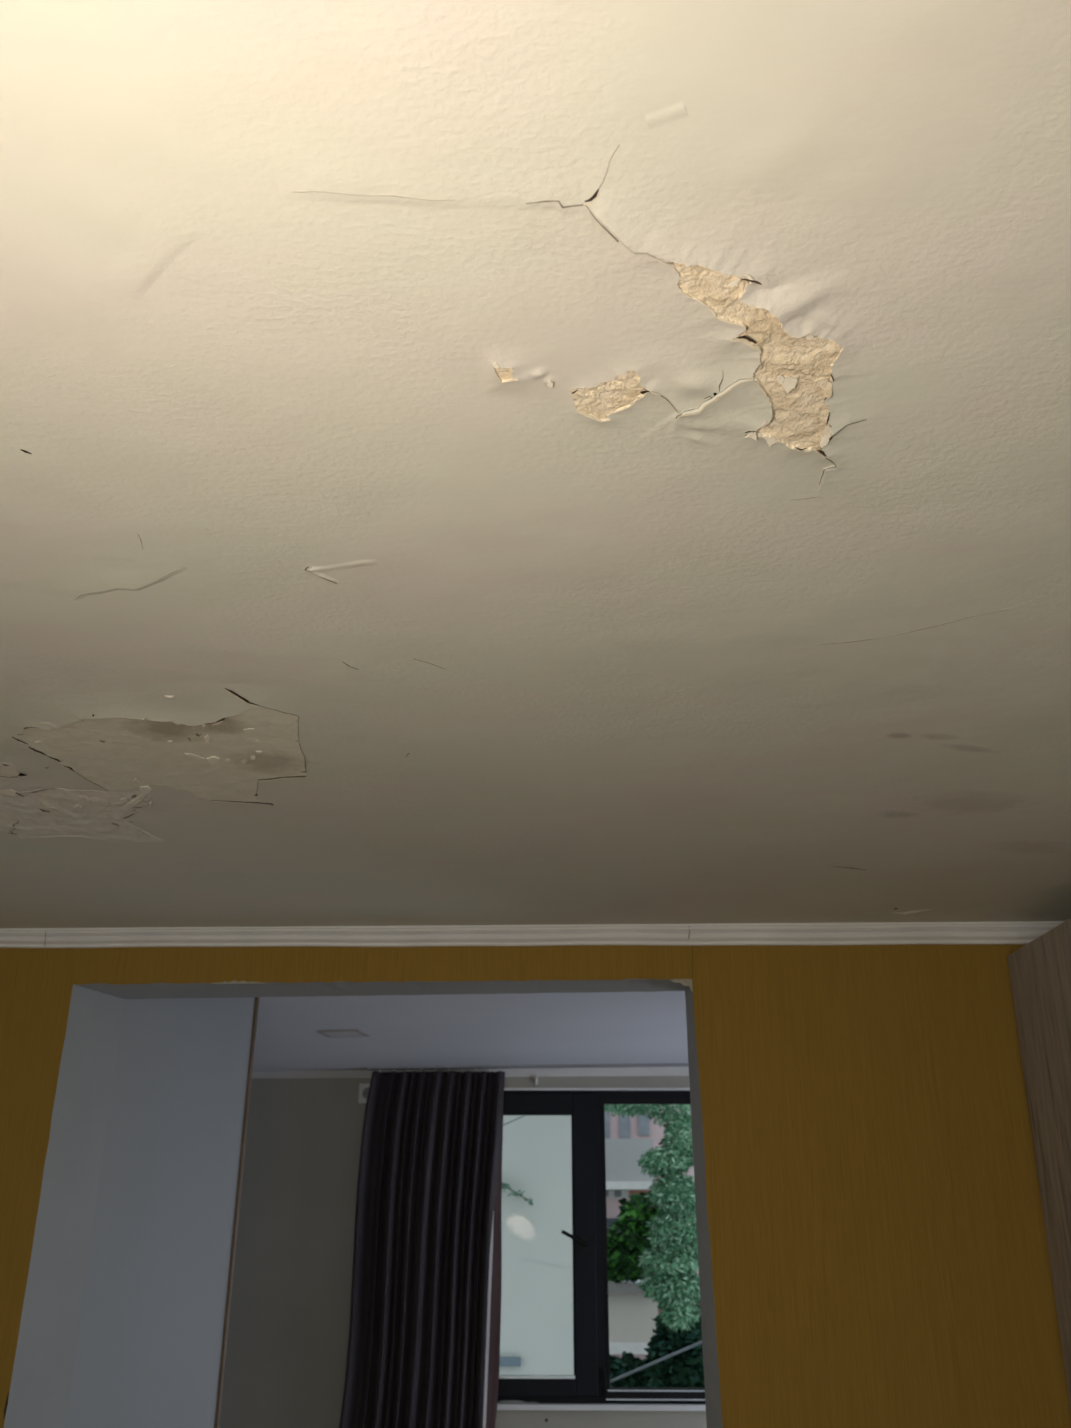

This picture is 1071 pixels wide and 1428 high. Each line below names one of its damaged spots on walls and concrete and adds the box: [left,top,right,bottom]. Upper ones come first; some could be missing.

crack [584,146,619,242]
peeling [558,141,906,529]